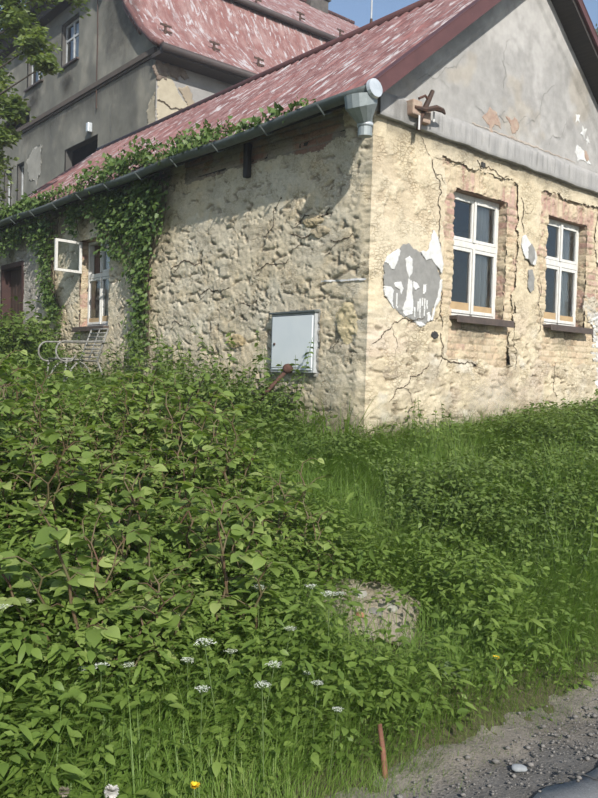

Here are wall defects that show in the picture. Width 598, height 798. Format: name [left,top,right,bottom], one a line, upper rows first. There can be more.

peeling [146,59,194,124]
peeling [26,145,42,187]
crack [422,138,507,245]
peeling [472,106,591,165]
crack [255,197,330,276]
spalling [383,155,598,388]
crack [372,271,480,402]